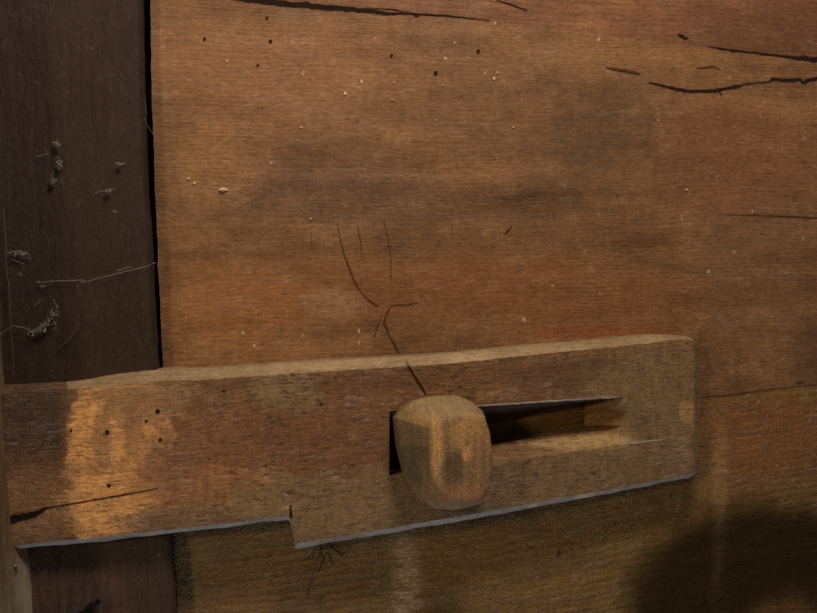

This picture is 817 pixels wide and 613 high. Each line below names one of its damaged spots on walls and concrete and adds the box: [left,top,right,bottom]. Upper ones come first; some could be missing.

crack [243,0,489,20]
crack [648,46,817,95]
crack [337,222,379,307]
crack [406,361,426,394]